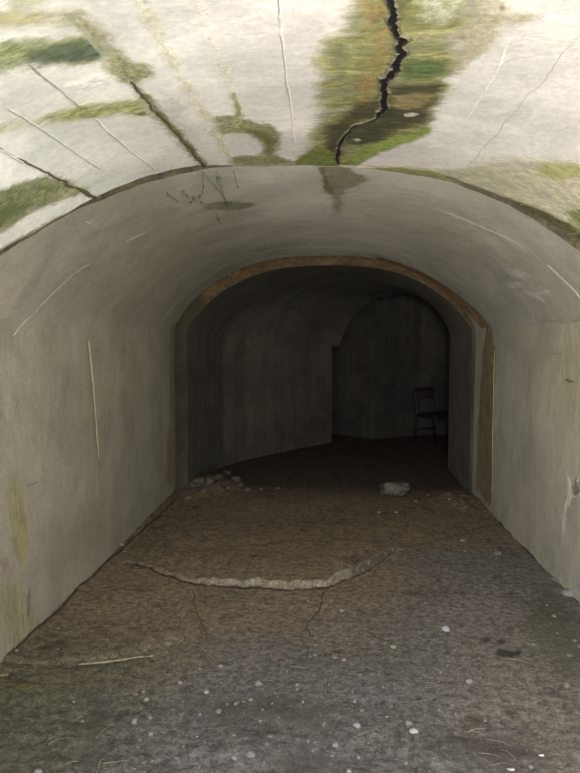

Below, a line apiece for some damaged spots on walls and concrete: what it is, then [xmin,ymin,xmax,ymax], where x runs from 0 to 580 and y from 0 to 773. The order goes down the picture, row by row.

crack [0,148,102,199]
crack [130,81,206,167]
crack [334,0,413,164]
damp [295,0,531,214]